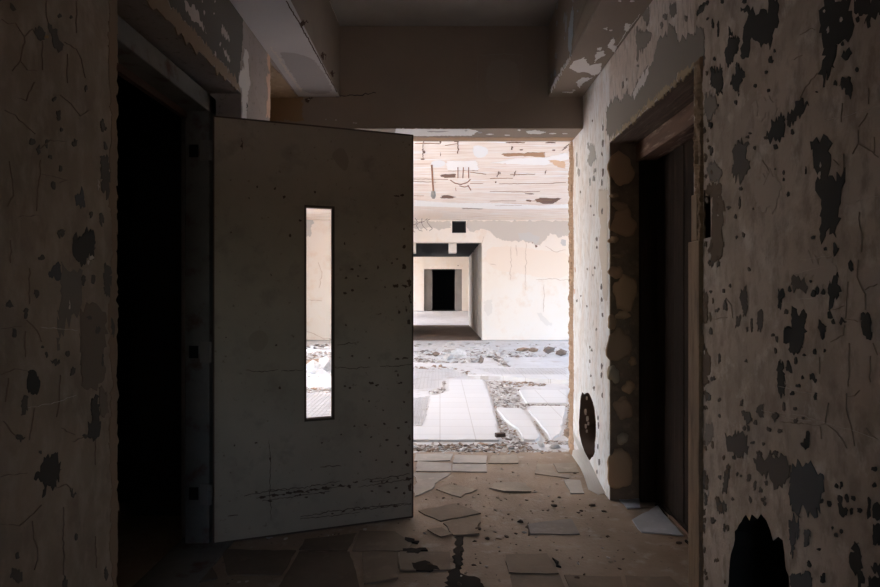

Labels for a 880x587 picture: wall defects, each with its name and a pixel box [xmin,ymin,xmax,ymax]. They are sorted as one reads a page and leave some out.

peeling [146,0,250,119]
spalling [57,0,119,587]
peeling [395,0,880,587]
peeling [21,370,40,415]
peeling [34,451,62,498]